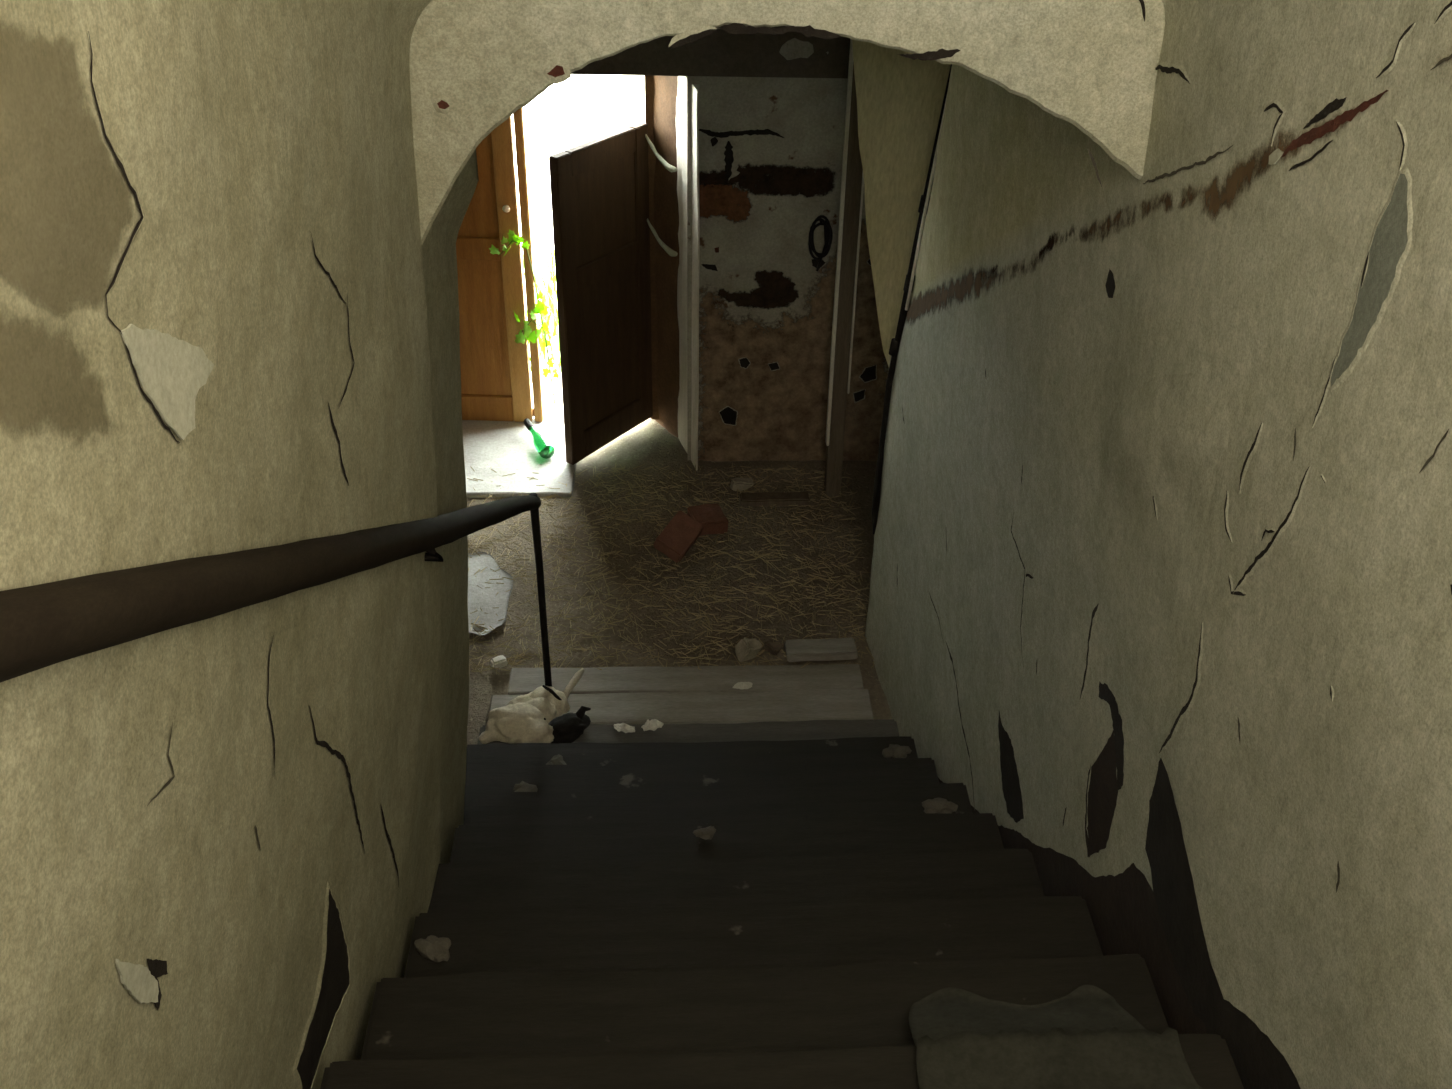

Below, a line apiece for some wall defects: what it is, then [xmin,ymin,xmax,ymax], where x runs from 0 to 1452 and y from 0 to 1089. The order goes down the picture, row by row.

spalling [669,23,841,48]
crack [1376,1,1452,79]
flaking render [699,123,835,223]
rust [906,132,1299,324]
peeling [1293,121,1413,460]
spalling [998,604,1301,1089]